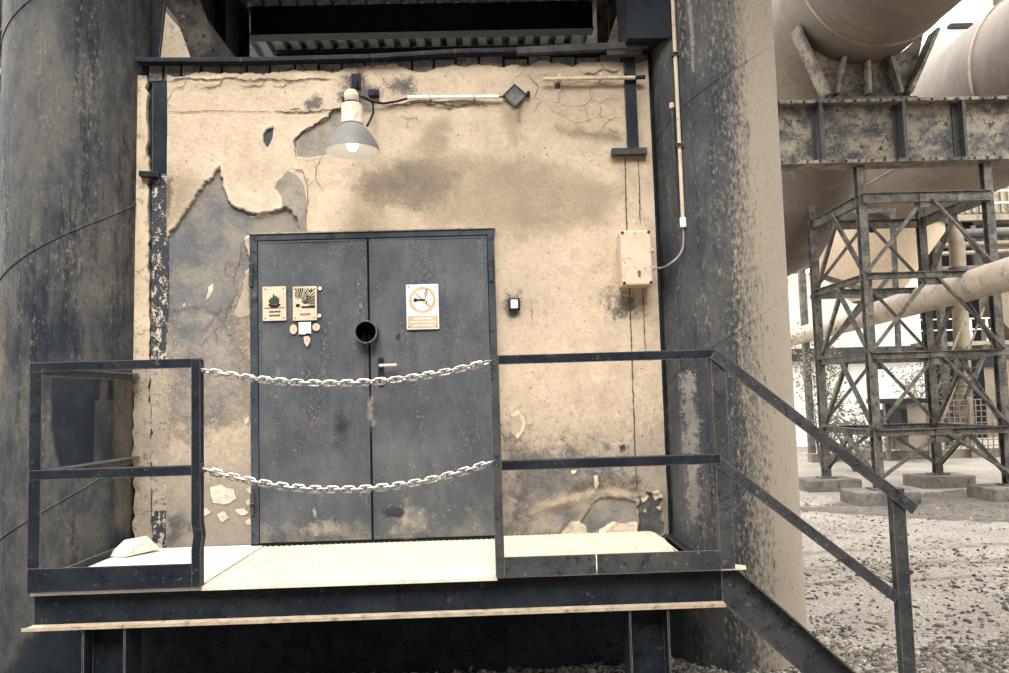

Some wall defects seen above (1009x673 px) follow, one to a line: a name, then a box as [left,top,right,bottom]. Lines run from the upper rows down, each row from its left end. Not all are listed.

crack [166,77,341,220]
spalling [263,128,273,148]
flaking render [293,110,341,158]
crack [512,64,621,135]
crack [624,157,641,231]
flaking render [166,167,307,444]
crack [629,288,657,531]
peeling [204,485,251,525]
flaking render [520,486,664,535]